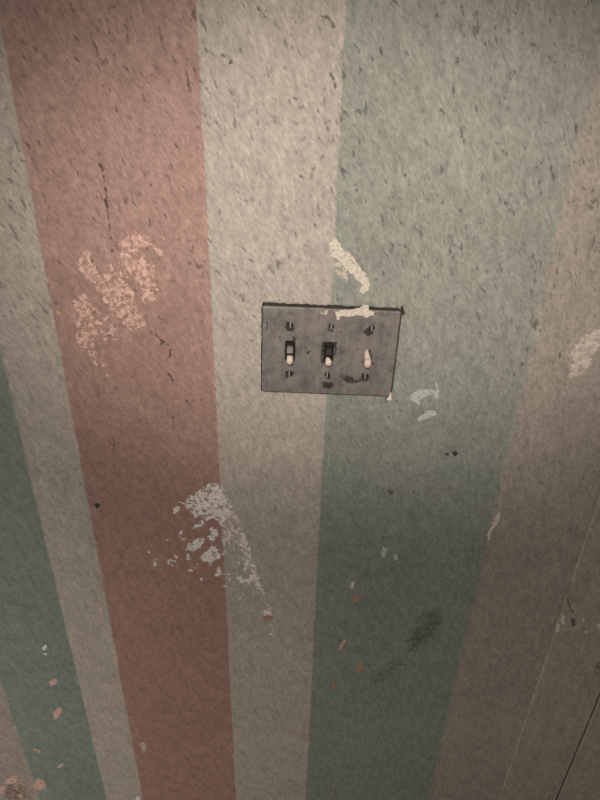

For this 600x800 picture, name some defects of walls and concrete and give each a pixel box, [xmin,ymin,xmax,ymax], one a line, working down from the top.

peeling [329,237,370,294]
peeling [71,232,165,377]
peeling [410,382,441,405]
peeling [418,410,437,421]
peeling [167,483,265,600]